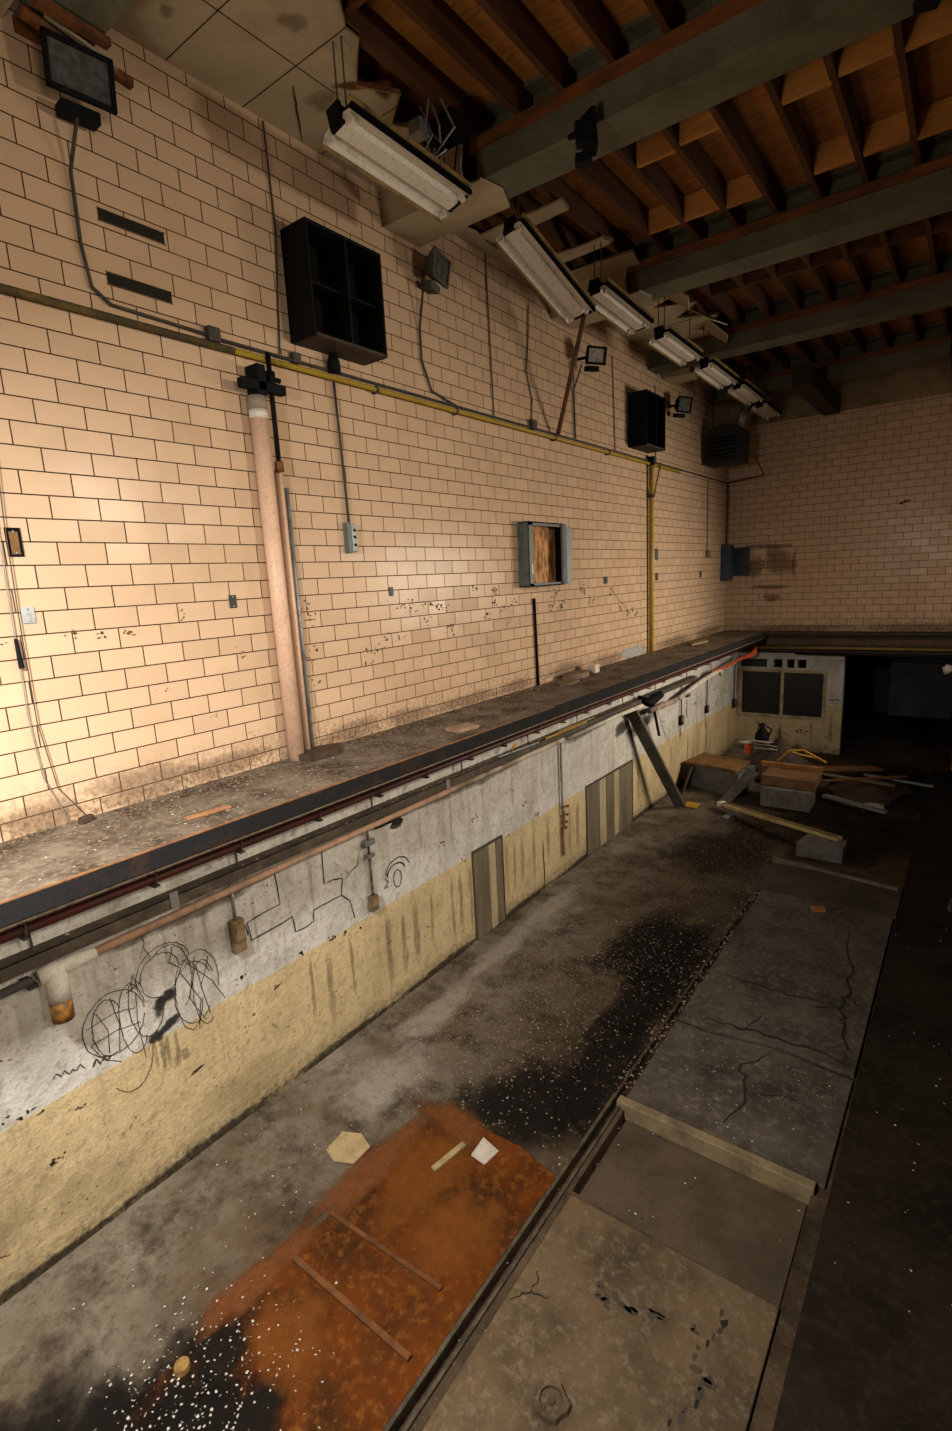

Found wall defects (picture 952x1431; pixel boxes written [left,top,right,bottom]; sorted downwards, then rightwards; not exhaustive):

leakage [300,773,692,1118]
crack [706,931,865,1123]
rust [202,1102,498,1334]